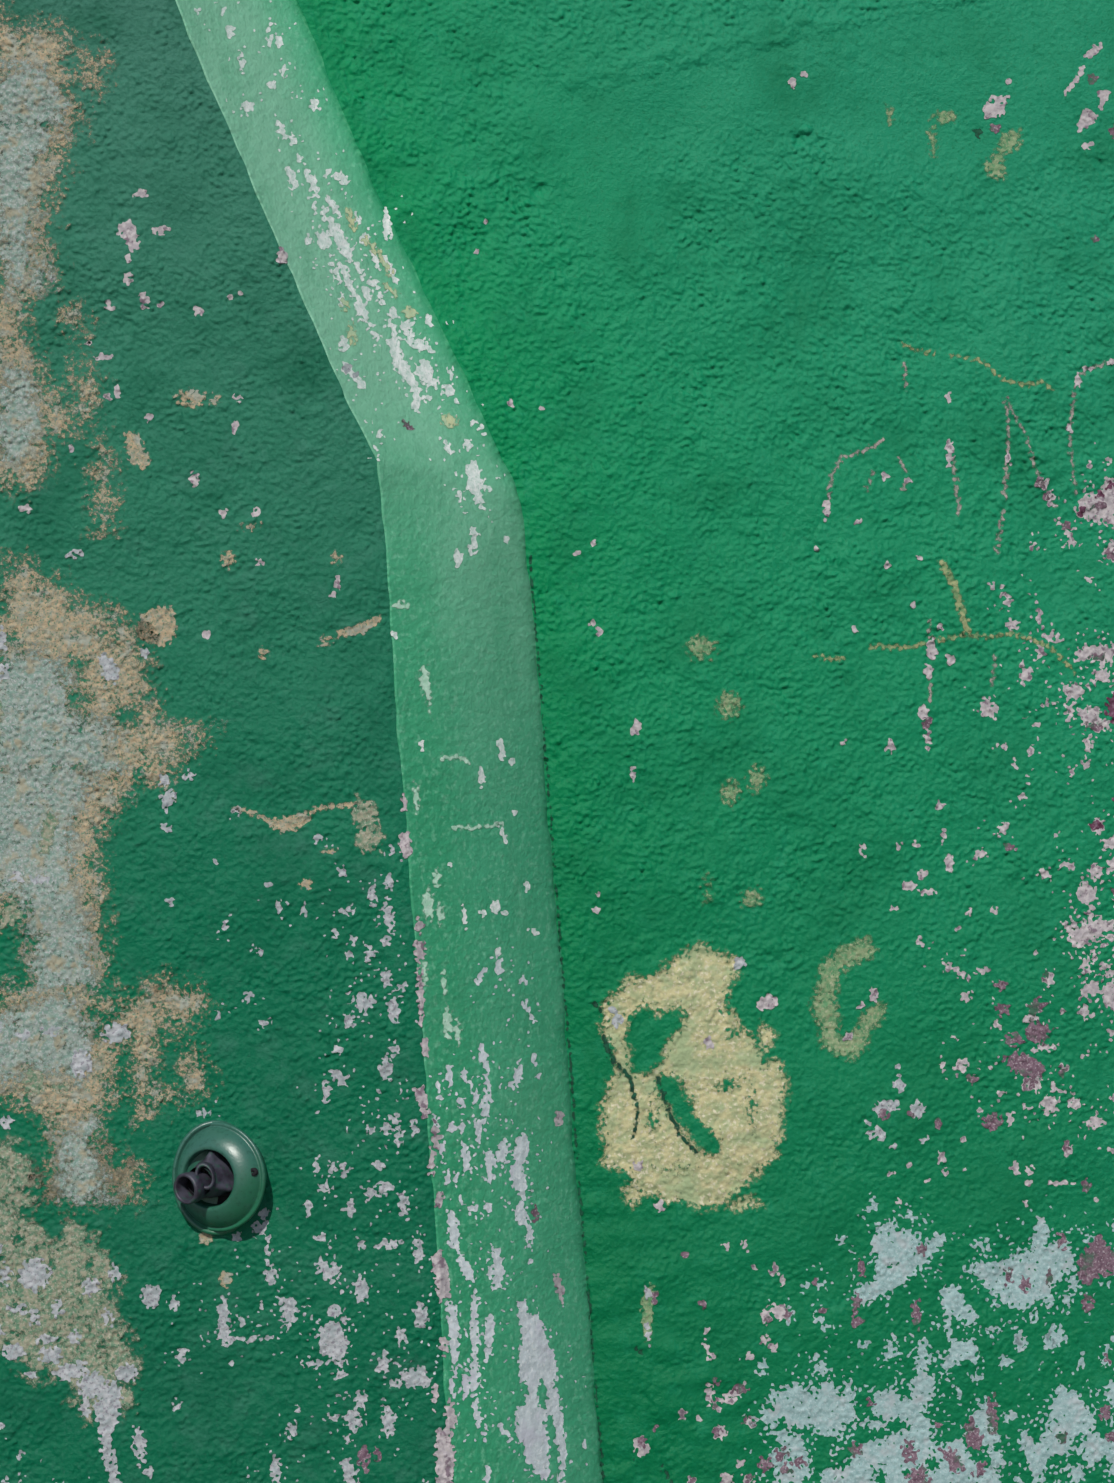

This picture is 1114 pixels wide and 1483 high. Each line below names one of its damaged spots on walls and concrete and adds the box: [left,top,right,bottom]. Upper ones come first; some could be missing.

peeling [1029,442,1114,591]
peeling [0,0,588,1483]
peeling [630,718,642,736]
peeling [889,869,937,911]
peeling [916,574,1114,1158]
peeling [639,1282,659,1348]
peeling [678,1064,1114,1483]
peeling [633,1424,659,1458]